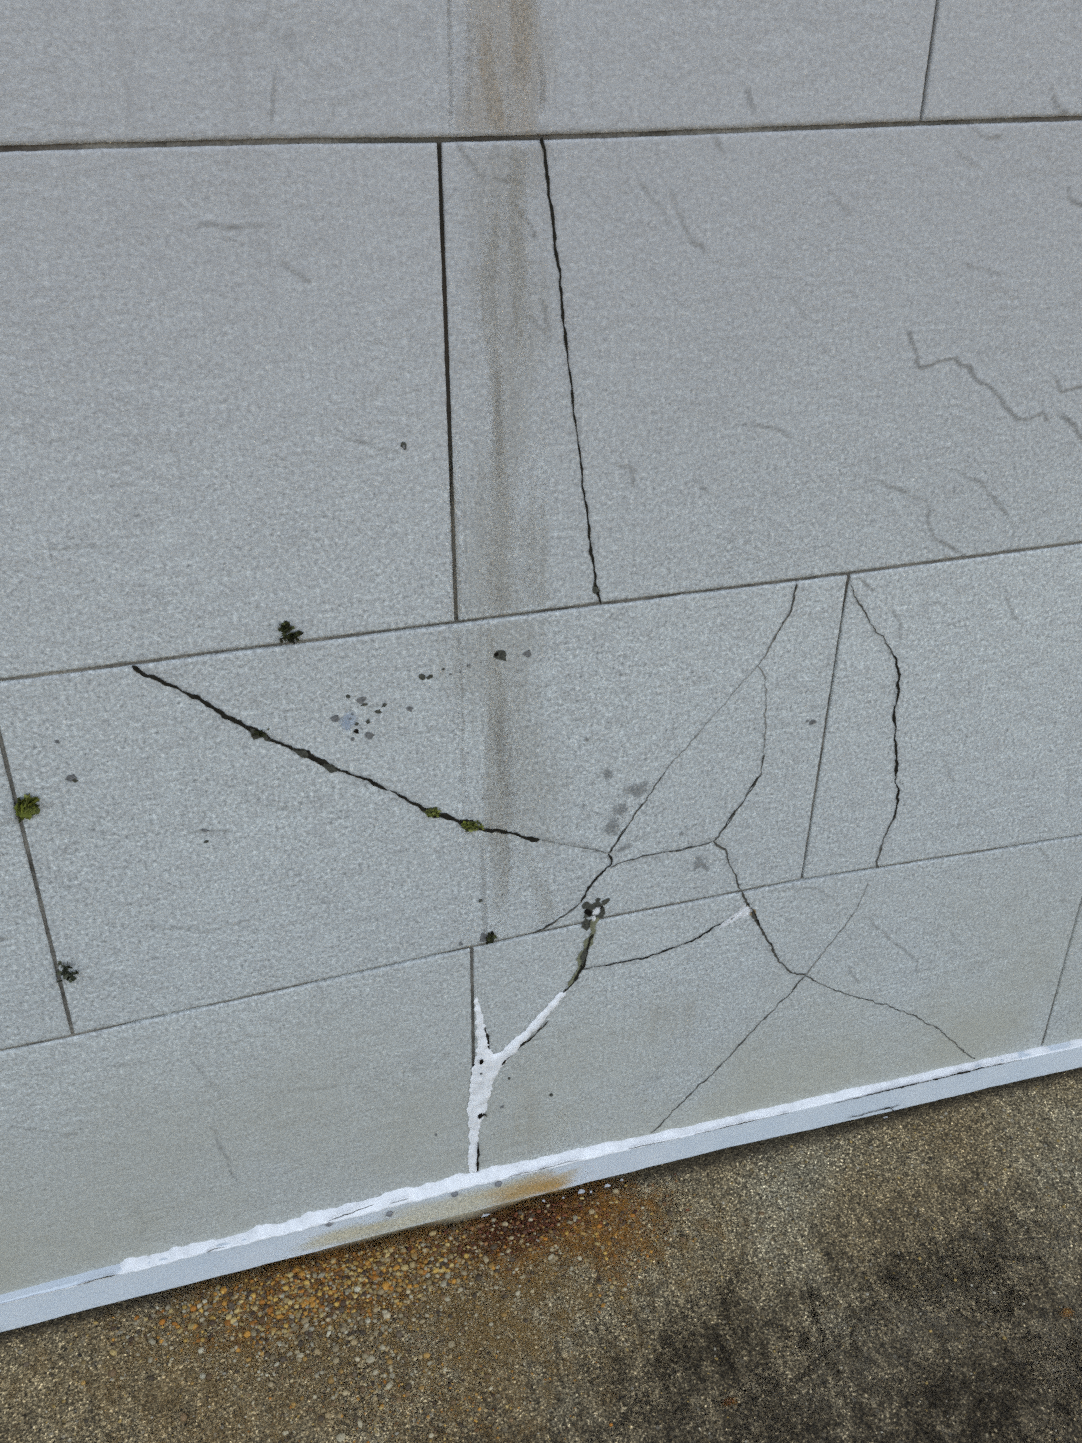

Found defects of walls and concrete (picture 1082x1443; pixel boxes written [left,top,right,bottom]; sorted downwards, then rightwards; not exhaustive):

crack [540,137,601,604]
crack [132,584,1022,1149]
crack [329,1198,409,1221]
rust [198,1177,654,1340]